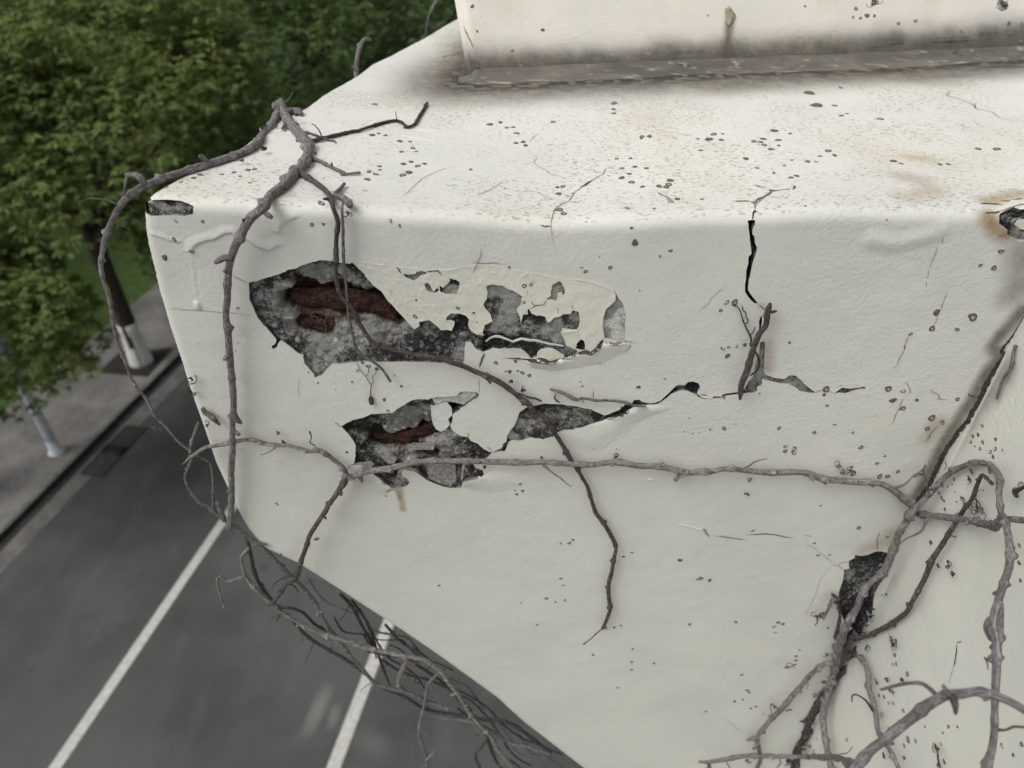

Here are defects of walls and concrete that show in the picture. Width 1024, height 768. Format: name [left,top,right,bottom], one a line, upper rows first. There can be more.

spalling [145,198,194,216]
crack [699,184,765,329]
spalling [249,260,626,377]
spalling [341,341,816,489]
spalling [839,551,887,649]